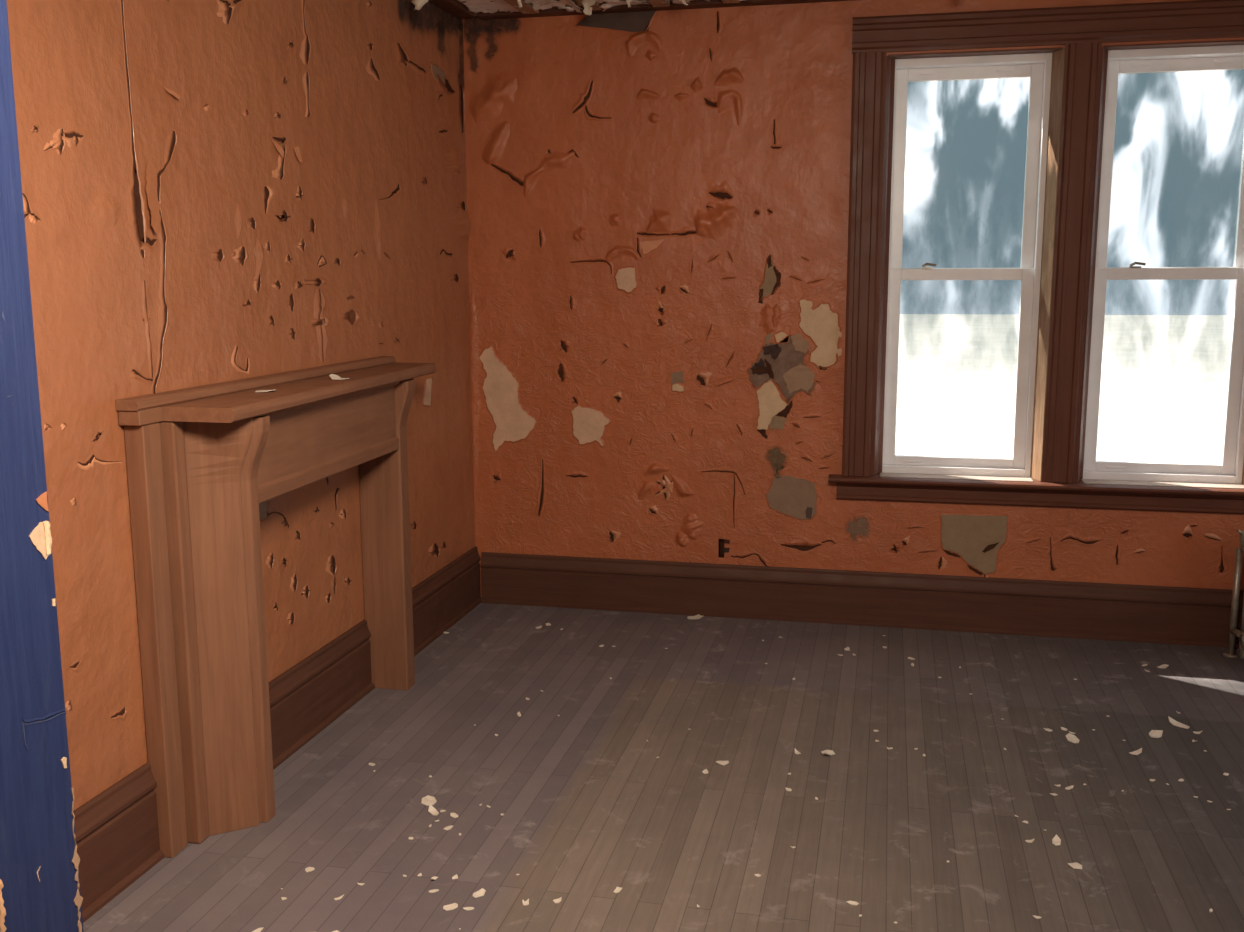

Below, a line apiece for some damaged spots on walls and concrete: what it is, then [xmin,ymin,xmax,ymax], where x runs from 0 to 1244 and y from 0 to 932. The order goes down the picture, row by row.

peeling [411,0,428,10]
leakage [399,0,519,88]
peeling [458,0,657,33]
crack [120,0,179,394]
peeling [758,254,782,304]
peeling [479,345,538,453]
peeling [570,404,612,447]
peeling [747,298,842,439]
peeling [29,491,52,560]
peeling [765,474,818,521]
peeling [939,512,1009,575]